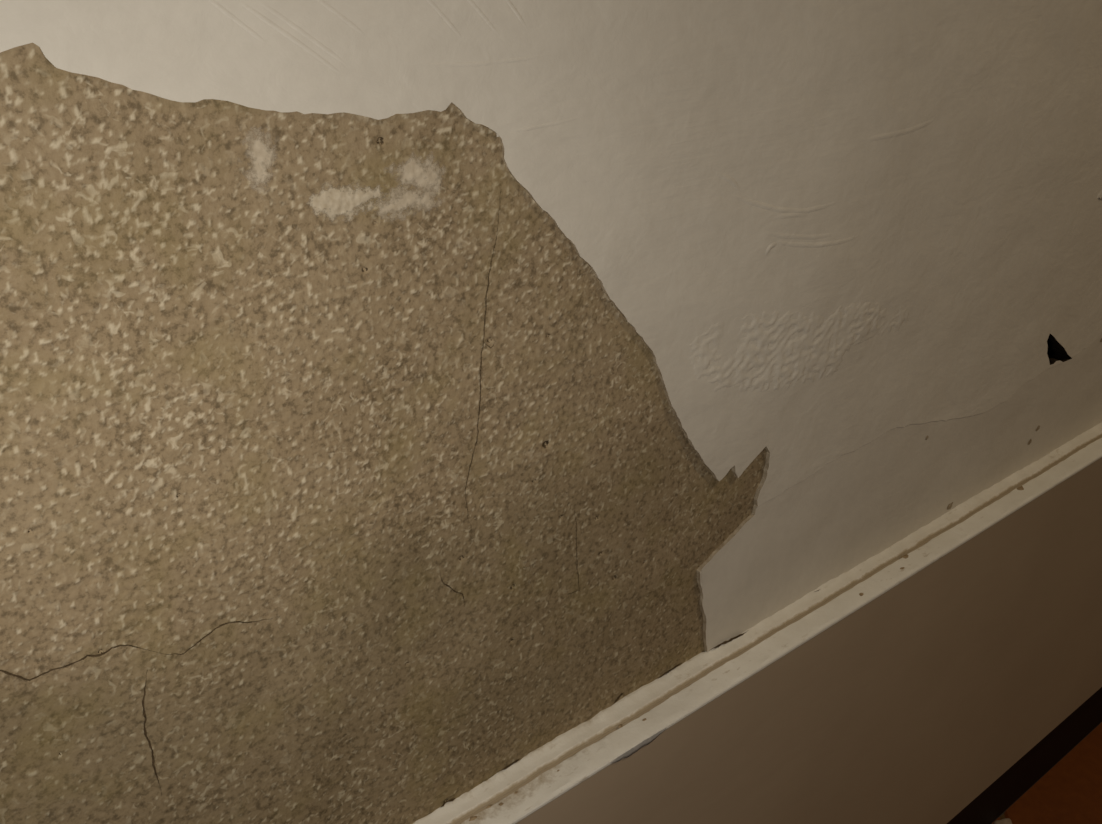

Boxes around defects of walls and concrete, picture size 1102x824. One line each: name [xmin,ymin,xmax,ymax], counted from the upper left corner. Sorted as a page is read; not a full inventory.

crack [0,619,265,681]
crack [142,683,161,789]
spalling [0,43,770,824]
peeling [701,334,1102,652]